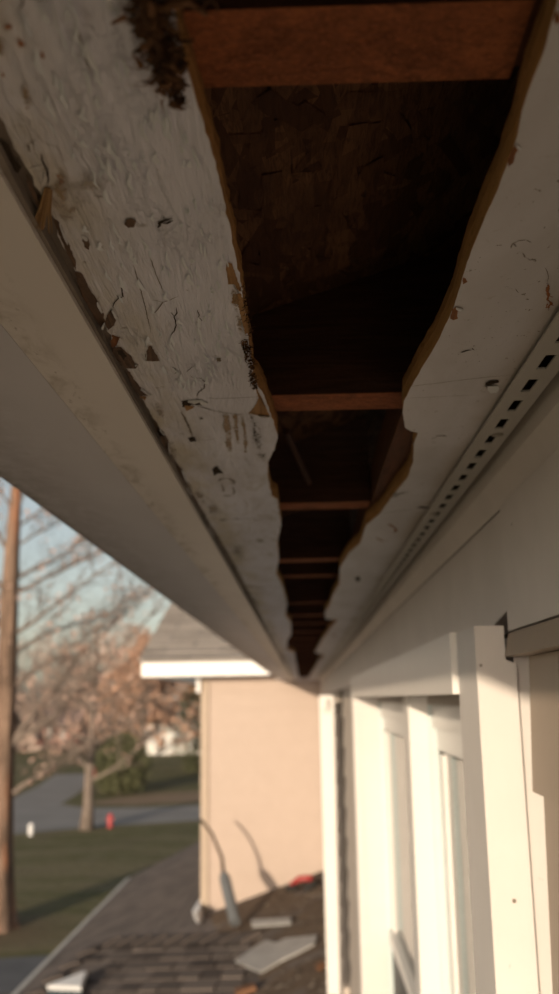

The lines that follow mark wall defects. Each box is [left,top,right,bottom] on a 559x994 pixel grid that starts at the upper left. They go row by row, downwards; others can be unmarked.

peeling [54,219,160,401]
peeling [226,263,249,336]
peeling [182,399,208,411]
peeling [249,389,270,418]